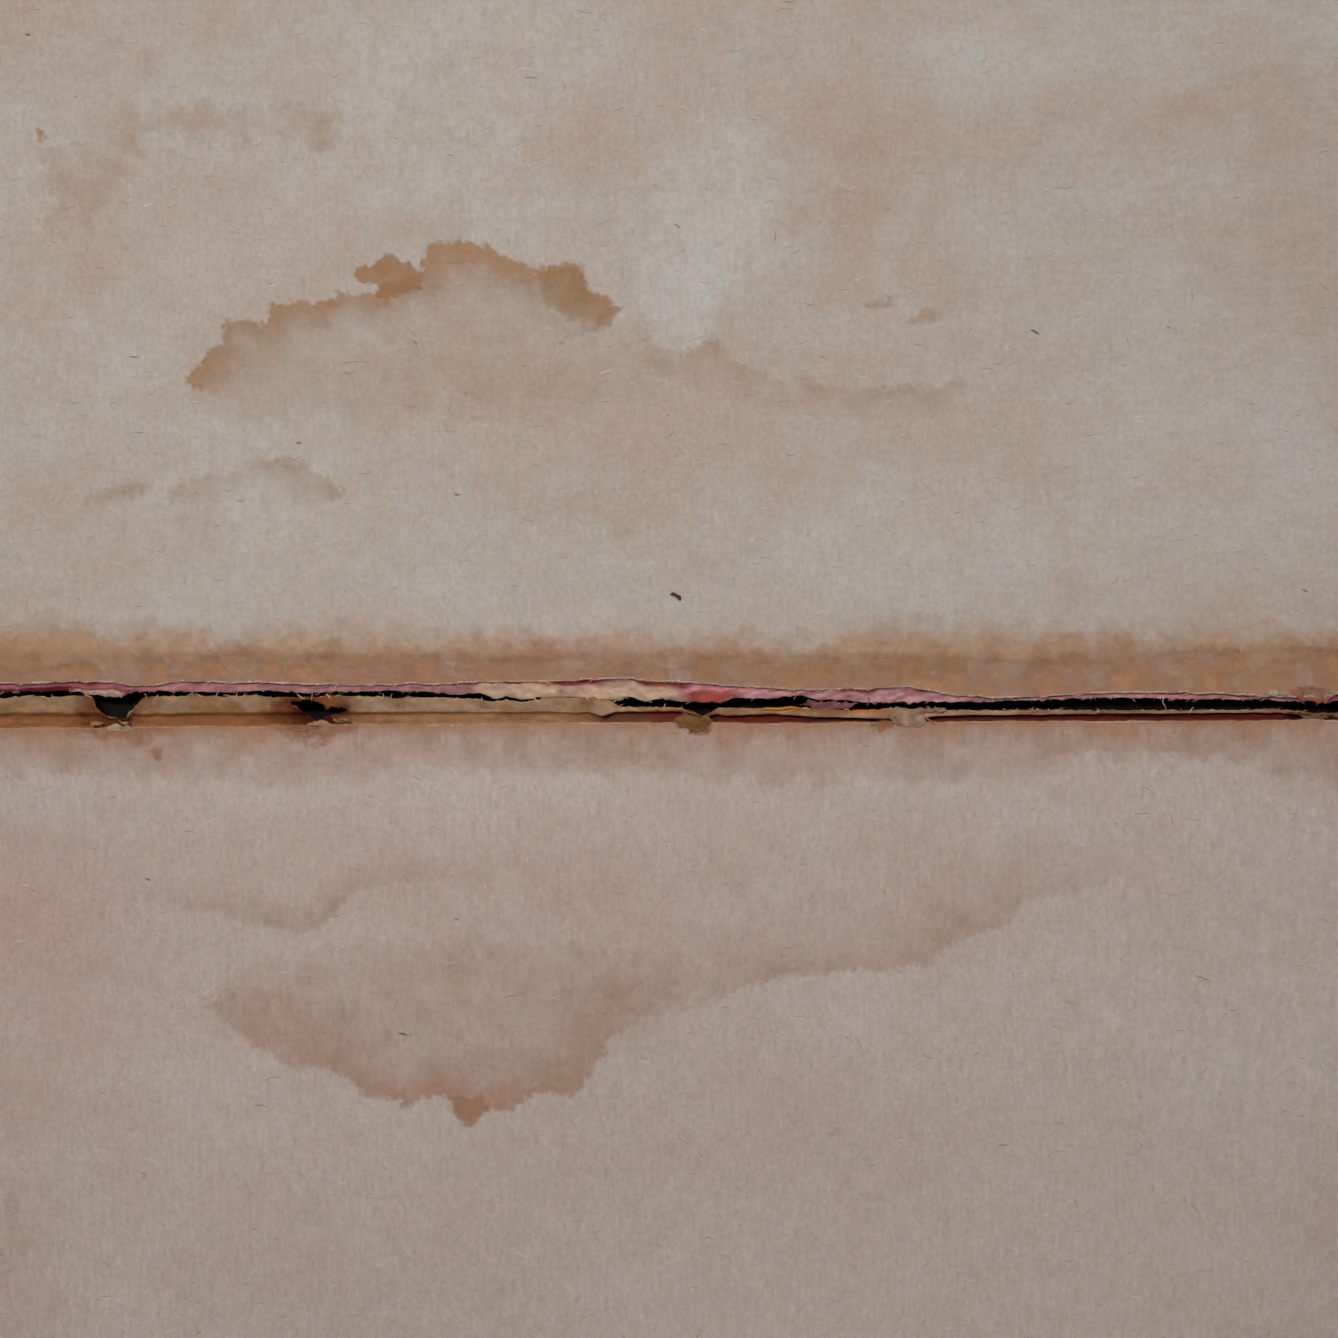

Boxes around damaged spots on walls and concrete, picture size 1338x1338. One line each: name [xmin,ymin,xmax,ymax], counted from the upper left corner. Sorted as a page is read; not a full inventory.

water stain [355,242,619,324]
water stain [245,294,343,331]
crack [0,678,1338,719]